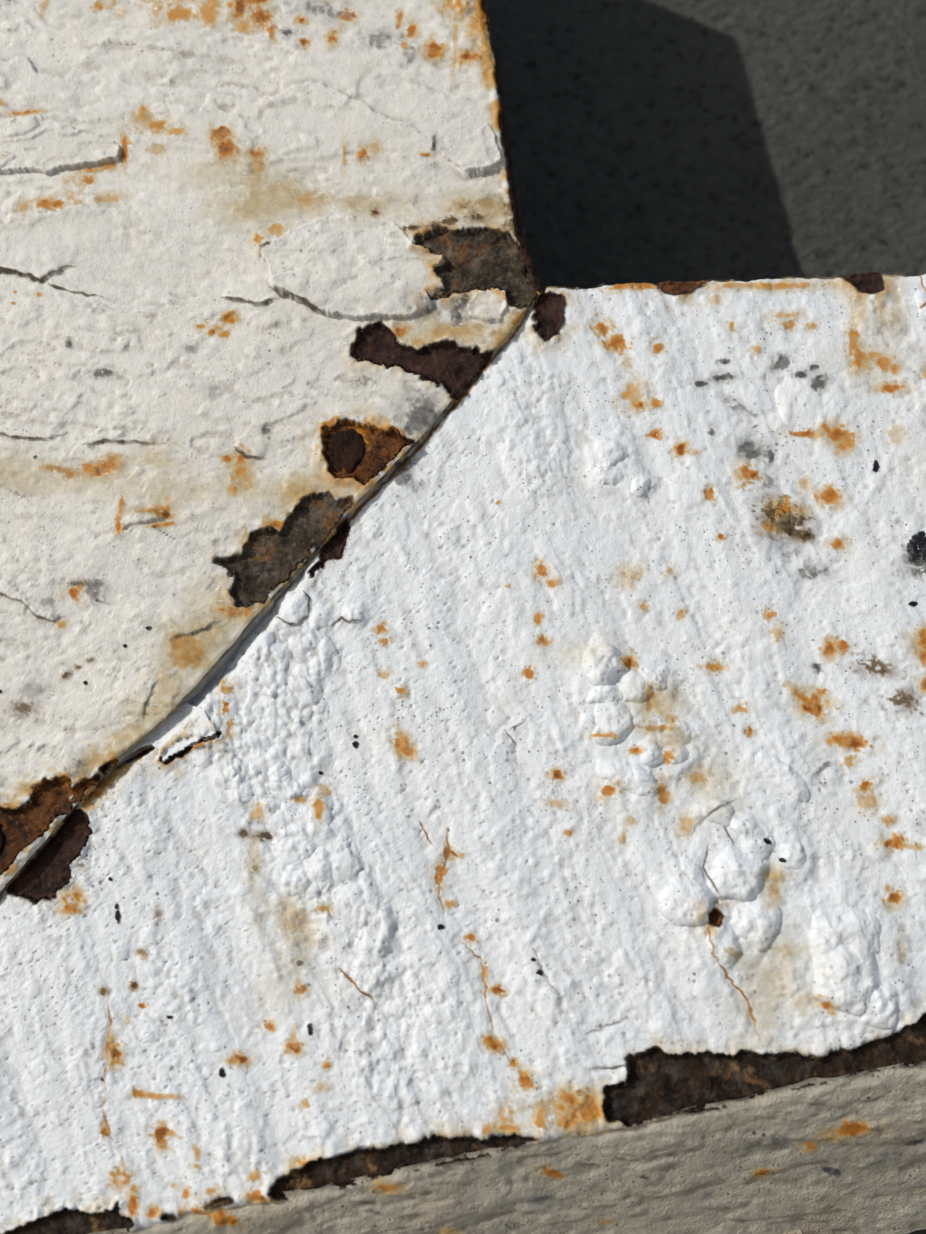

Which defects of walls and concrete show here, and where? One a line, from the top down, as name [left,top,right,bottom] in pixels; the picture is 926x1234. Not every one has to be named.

corrosion [147,0,276,42]
peeling [258,0,566,401]
crack [0,265,102,297]
crack [222,287,324,315]
crack [347,306,533,522]
corrosion [752,478,842,541]
peeling [0,703,221,904]
crack [694,801,756,1029]
corrosion [481,1035,539,1096]
peeling [602,1013,926,1127]
corrosion [533,1086,609,1137]
peeling [268,1133,538,1201]